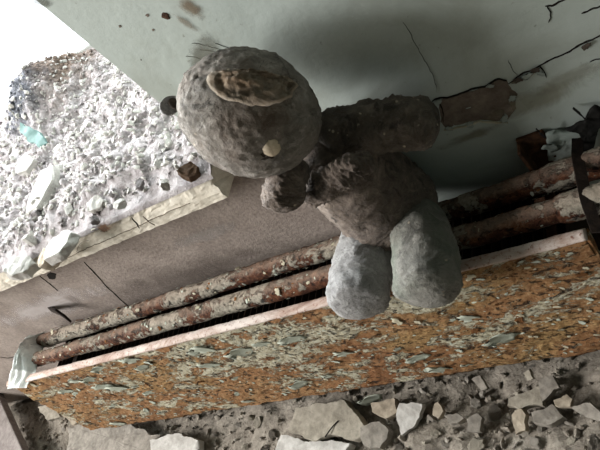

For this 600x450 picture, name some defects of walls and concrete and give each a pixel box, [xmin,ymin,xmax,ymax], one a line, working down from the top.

crack [545,0,565,23]
crack [508,35,600,84]
spalling [432,78,518,131]
peeling [541,129,580,161]